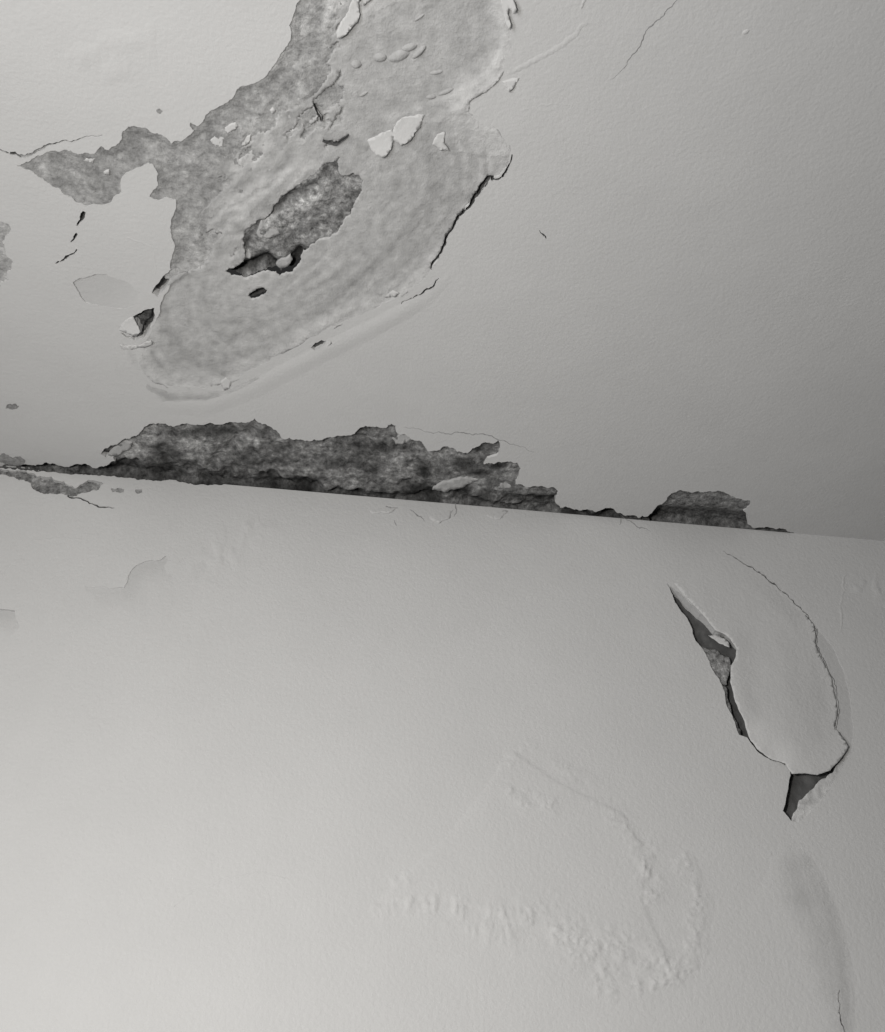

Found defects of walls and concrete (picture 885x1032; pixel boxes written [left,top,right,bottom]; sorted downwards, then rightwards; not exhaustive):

spalling [0,222,13,286]
peeling [18,0,519,391]
spalling [0,419,792,533]
peeling [673,553,853,822]